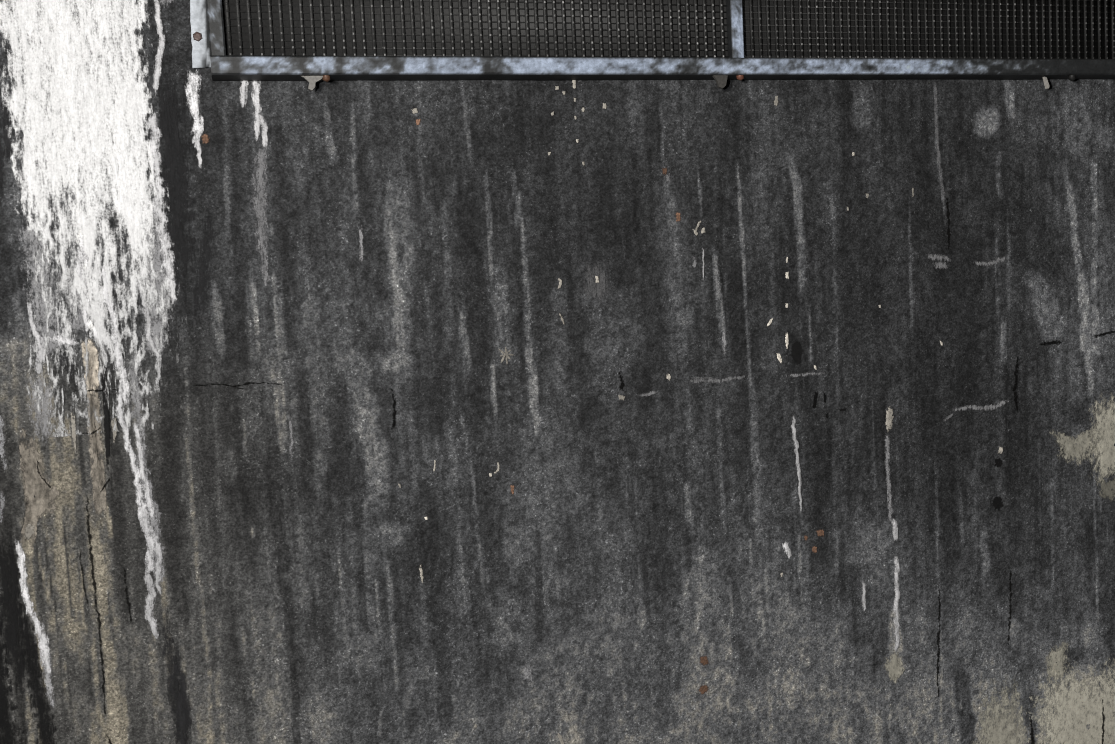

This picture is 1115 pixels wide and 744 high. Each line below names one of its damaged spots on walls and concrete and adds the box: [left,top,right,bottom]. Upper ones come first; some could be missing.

leakage [0,0,215,744]
crack [79,479,112,744]
crack [123,570,131,623]